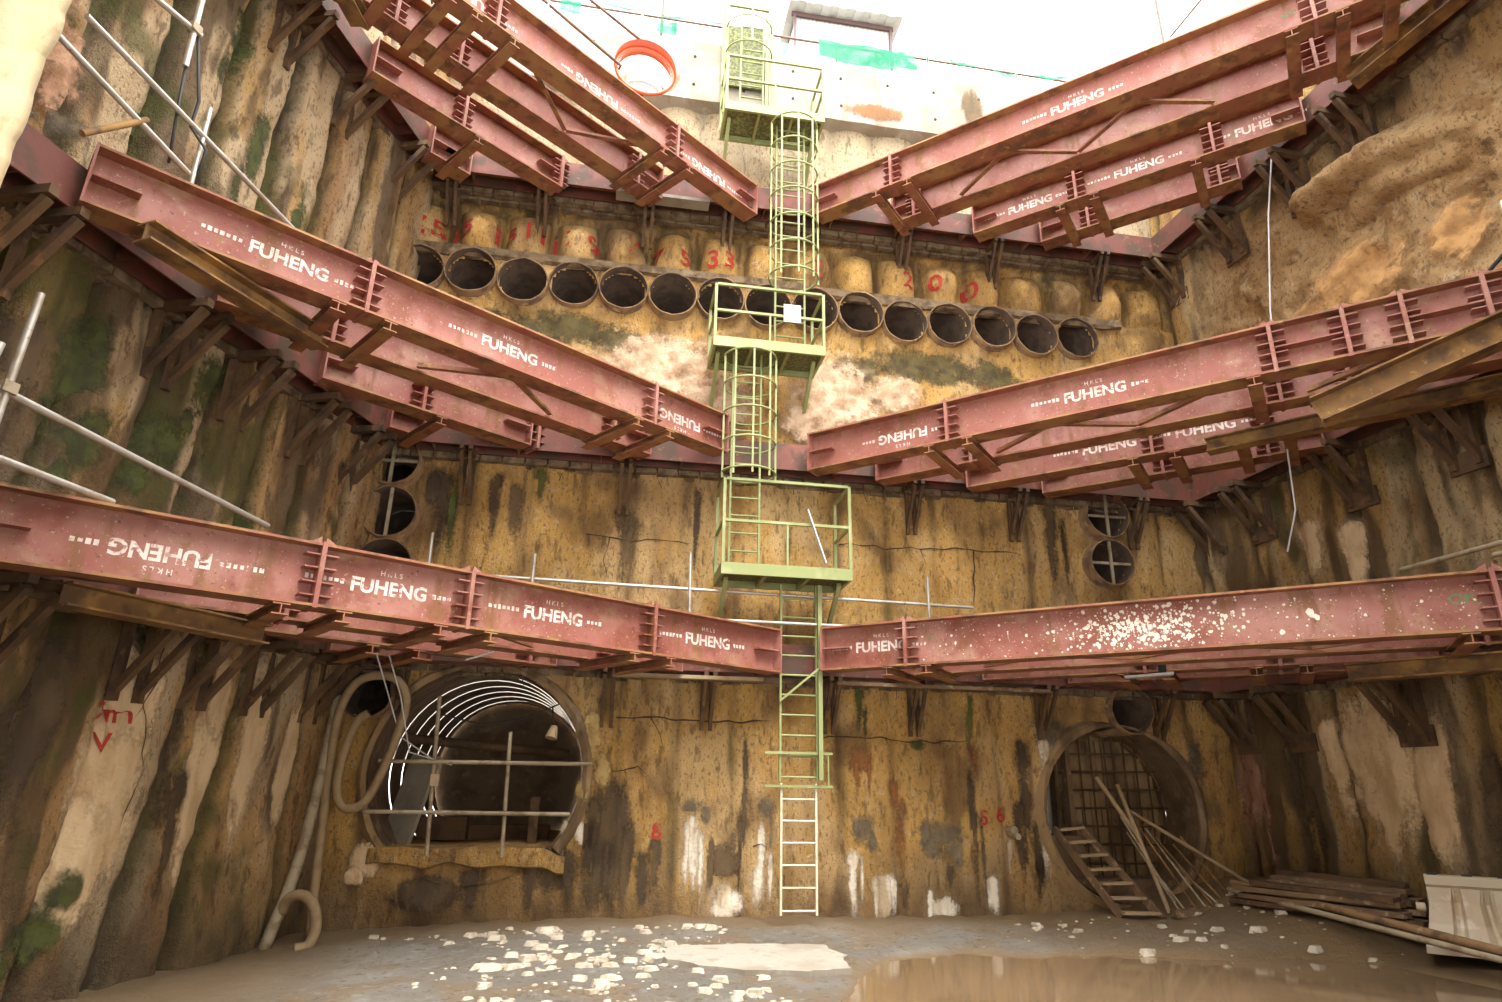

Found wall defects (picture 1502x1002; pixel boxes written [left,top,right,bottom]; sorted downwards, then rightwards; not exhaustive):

water stain [425,468,458,552]
water stain [488,473,526,537]
water stain [615,505,640,575]
water stain [693,491,702,565]
water stain [522,775,662,910]
water stain [682,740,773,917]
water stain [847,818,908,918]
water stain [920,717,1061,917]